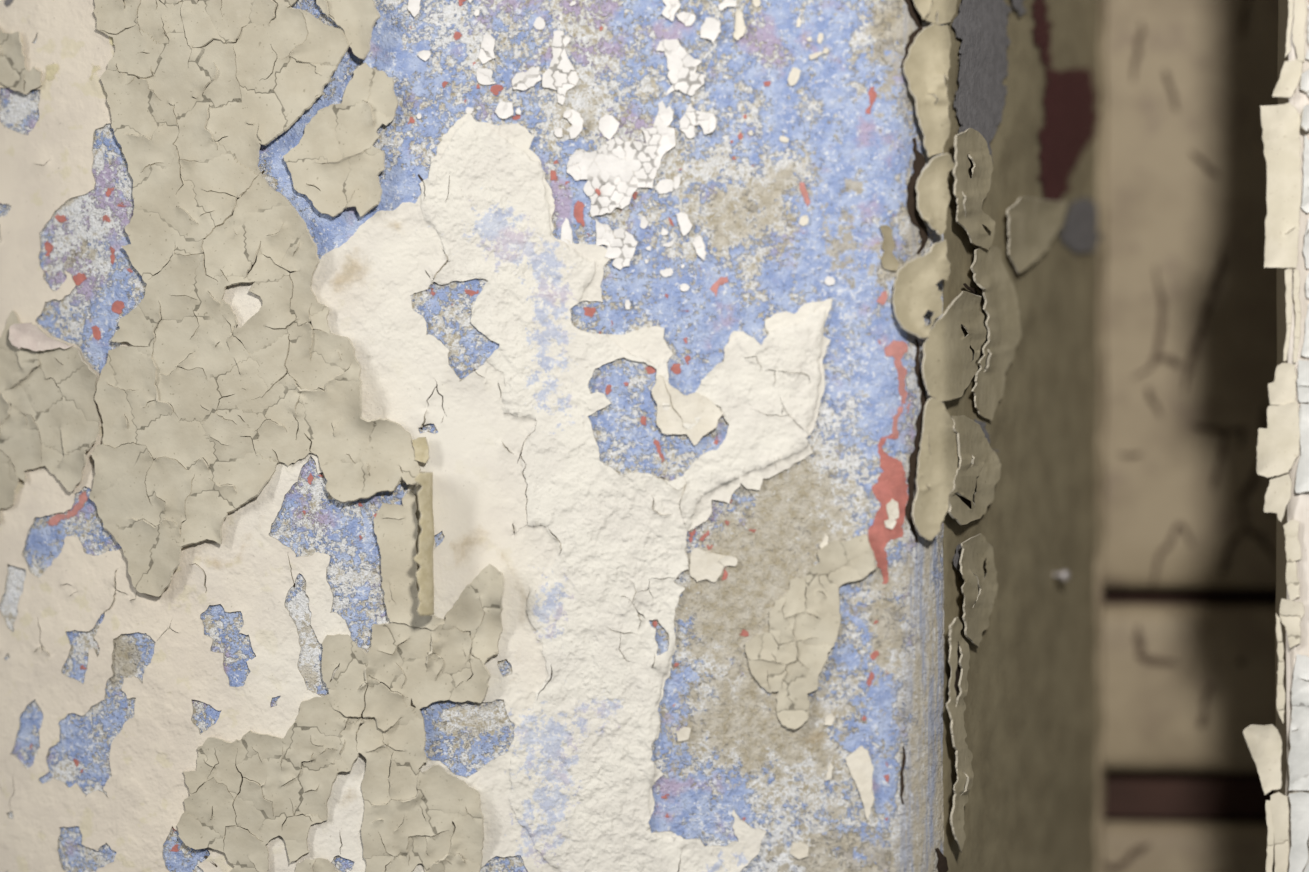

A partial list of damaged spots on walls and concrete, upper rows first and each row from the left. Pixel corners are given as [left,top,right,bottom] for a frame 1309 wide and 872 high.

spalling [0,0,1022,872]
peeling [1006,197,1067,274]
peeling [1243,0,1309,872]